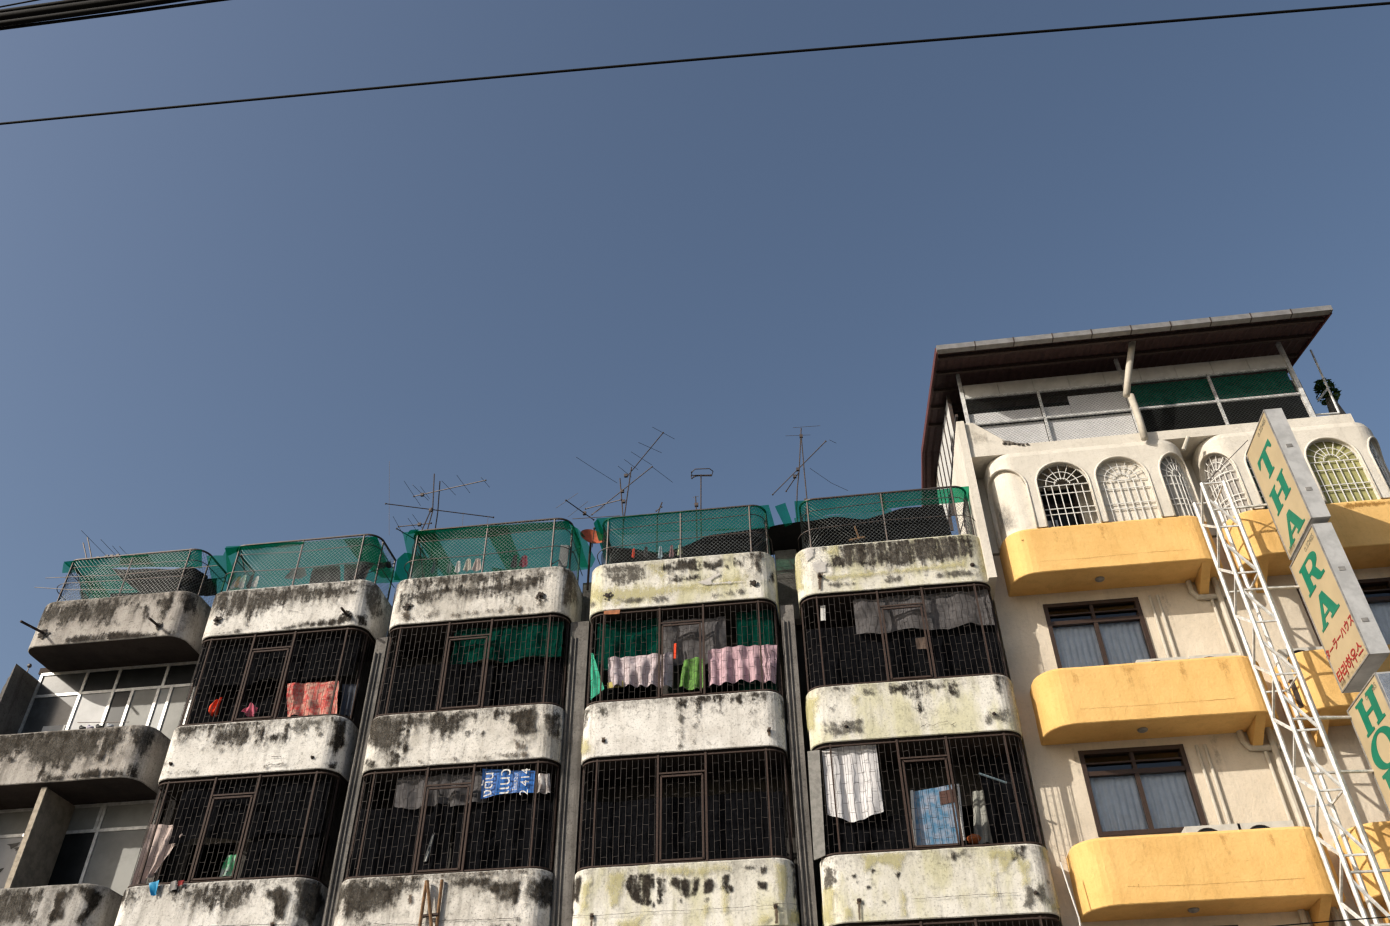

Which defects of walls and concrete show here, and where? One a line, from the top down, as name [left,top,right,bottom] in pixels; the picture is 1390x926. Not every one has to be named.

water stain [604,552,775,603]
water stain [822,535,976,587]
water stain [38,568,595,643]
water stain [0,727,155,782]
water stain [178,717,346,769]
water stain [365,707,562,768]
water stain [676,692,785,749]
water stain [807,680,960,737]
water stain [0,885,104,926]
water stain [168,870,553,926]
water stain [571,876,581,913]
water stain [824,868,875,905]